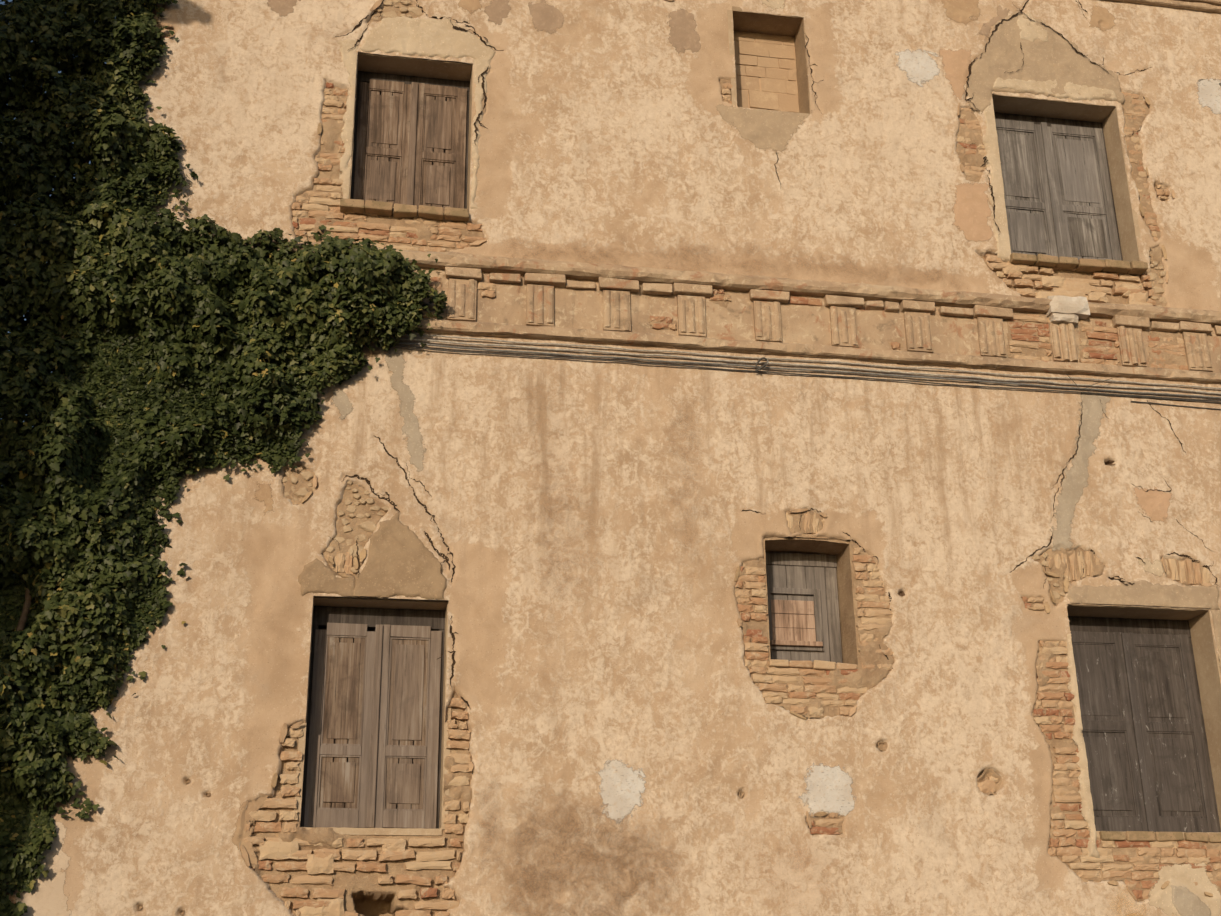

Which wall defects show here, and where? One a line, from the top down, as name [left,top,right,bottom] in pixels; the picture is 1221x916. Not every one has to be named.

crack [416,0,503,145]
crack [965,0,1150,136]
flaking render [292,82,487,252]
flaking render [981,92,1175,307]
flaking render [1006,314,1052,361]
crack [343,436,456,582]
crack [1009,401,1109,588]
crack [1081,481,1220,587]
crack [437,616,470,708]
flaking render [734,539,905,720]
flaking render [240,693,474,916]
flaking render [1032,641,1221,902]